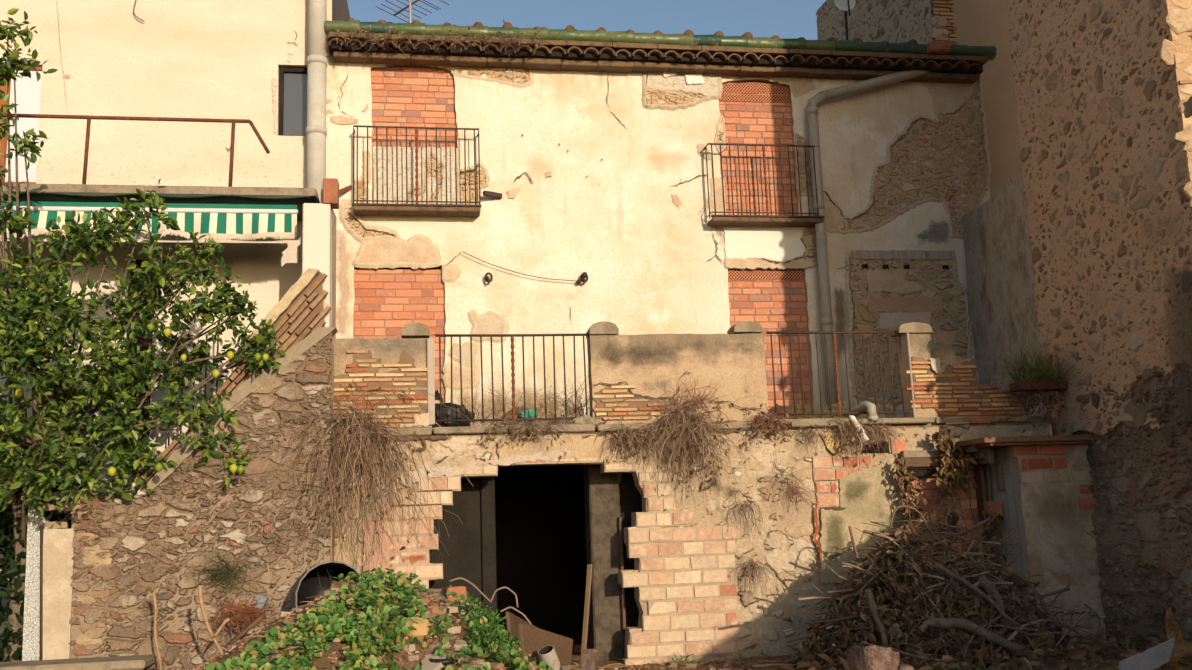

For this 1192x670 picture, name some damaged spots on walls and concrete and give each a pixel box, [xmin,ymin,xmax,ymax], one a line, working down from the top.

flaking render [338,146,490,283]
flaking render [641,71,723,111]
spalling [697,115,726,160]
spalling [706,77,991,270]
spalling [592,383,678,420]
spalling [844,253,1039,425]